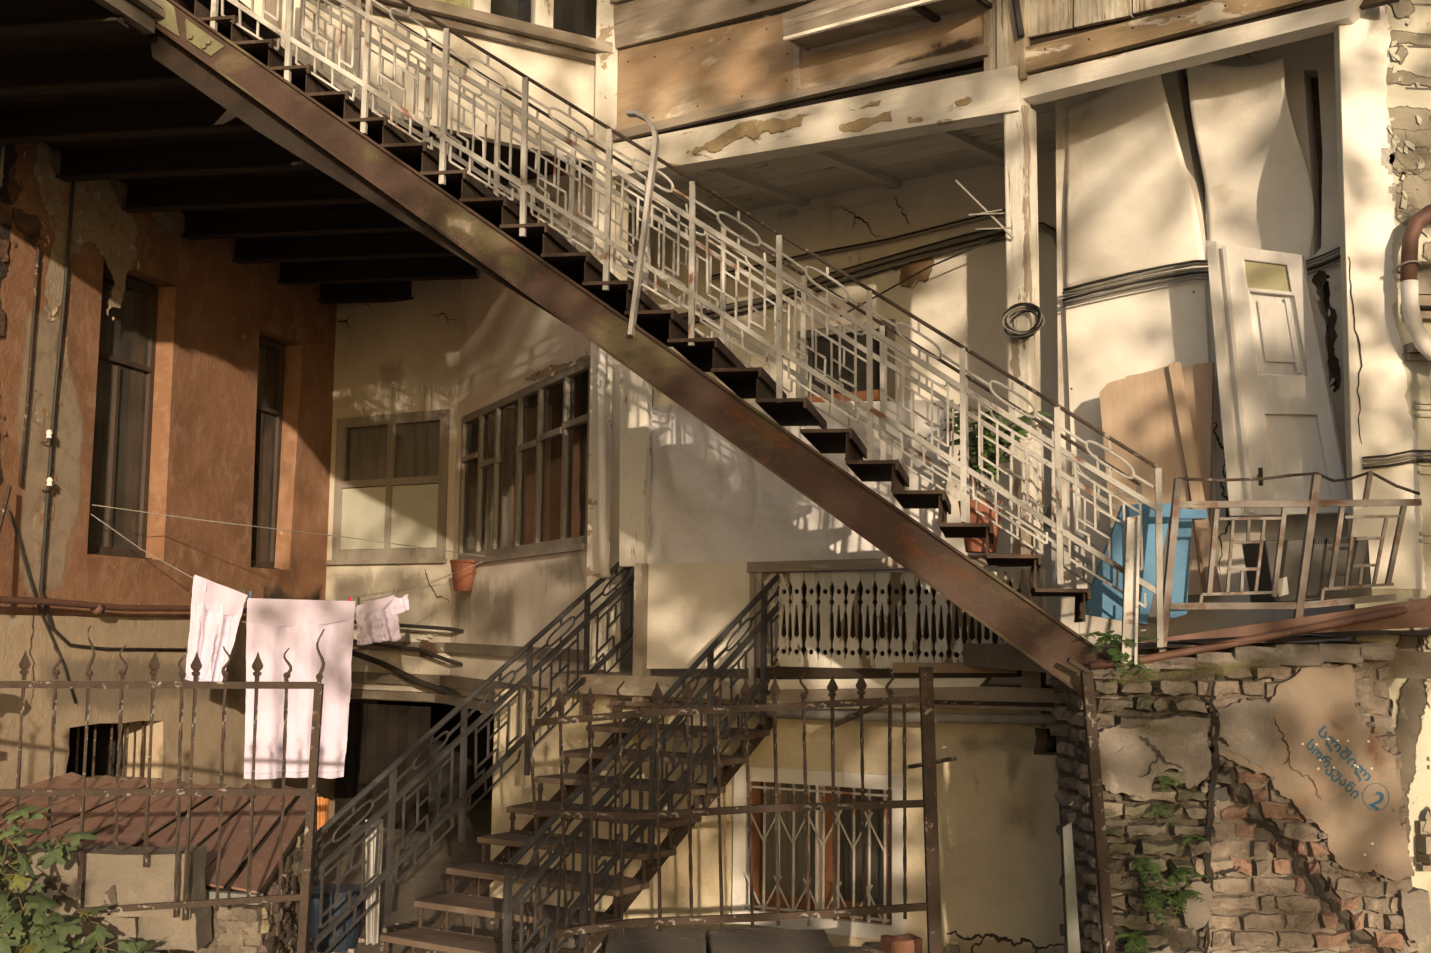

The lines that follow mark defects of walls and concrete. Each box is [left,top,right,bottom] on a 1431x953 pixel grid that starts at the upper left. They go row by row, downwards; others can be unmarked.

peeling [1386,0,1431,87]
peeling [687,114,803,158]
peeling [839,100,926,133]
peeling [1381,105,1431,260]
peeling [0,143,140,593]
crack [1138,680,1384,953]
spalling [1423,809,1431,834]
crack [947,930,1064,953]